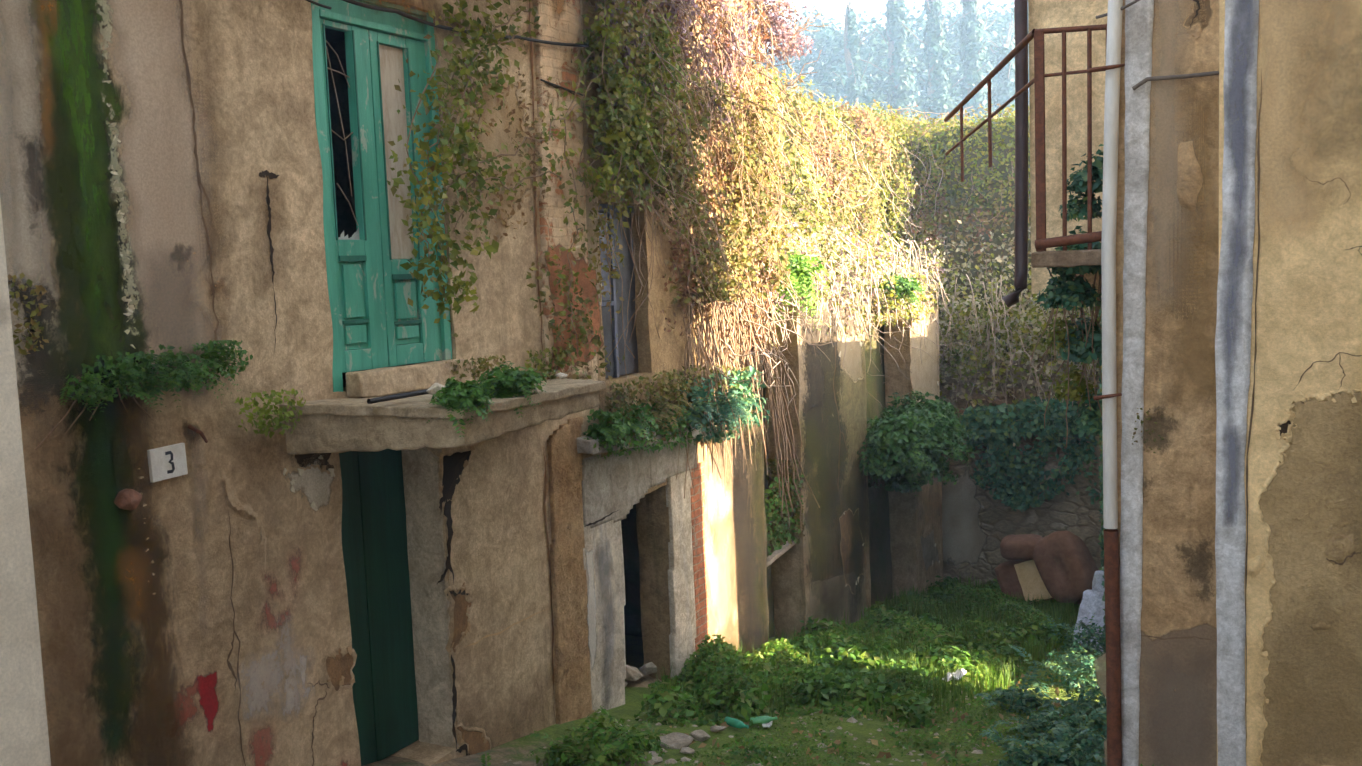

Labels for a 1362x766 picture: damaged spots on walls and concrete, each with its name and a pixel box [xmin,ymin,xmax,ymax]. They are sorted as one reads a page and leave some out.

peeling [1181,0,1216,39]
crack [179,0,219,340]
crack [259,170,279,358]
spalling [538,191,603,369]
damp [0,0,217,766]
crack [1293,352,1362,390]
spalling [283,453,336,511]
crack [437,452,469,596]
peeling [1254,385,1362,766]
spalling [322,644,357,695]
crack [451,655,470,756]